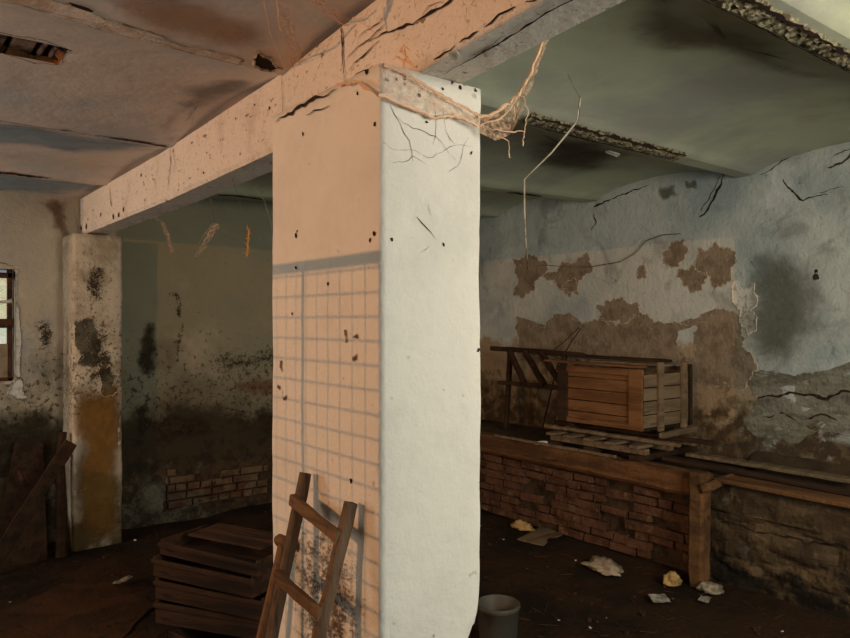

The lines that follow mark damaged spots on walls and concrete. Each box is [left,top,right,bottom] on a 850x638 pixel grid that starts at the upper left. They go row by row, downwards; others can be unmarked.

peeling [0,0,284,72]
crack [368,0,451,42]
crack [445,0,573,74]
spalling [703,0,850,73]
crack [276,89,335,122]
spalling [519,112,686,161]
damp [753,262,808,356]
damp [34,322,56,348]
damp [138,325,156,373]
peeling [512,238,850,443]
damp [257,408,273,434]
crack [757,390,850,421]